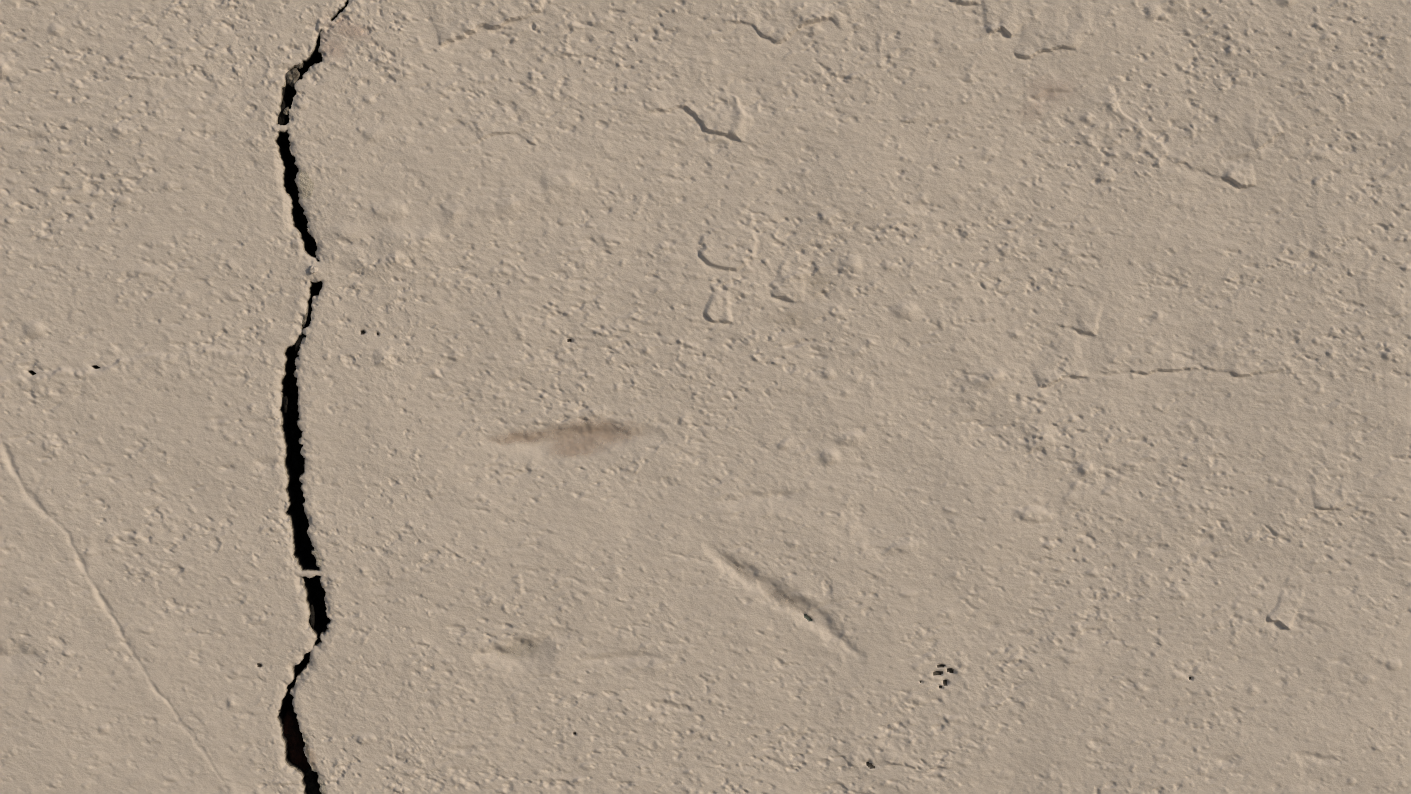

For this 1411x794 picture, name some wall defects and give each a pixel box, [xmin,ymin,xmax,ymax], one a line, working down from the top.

crack [274,0,349,794]